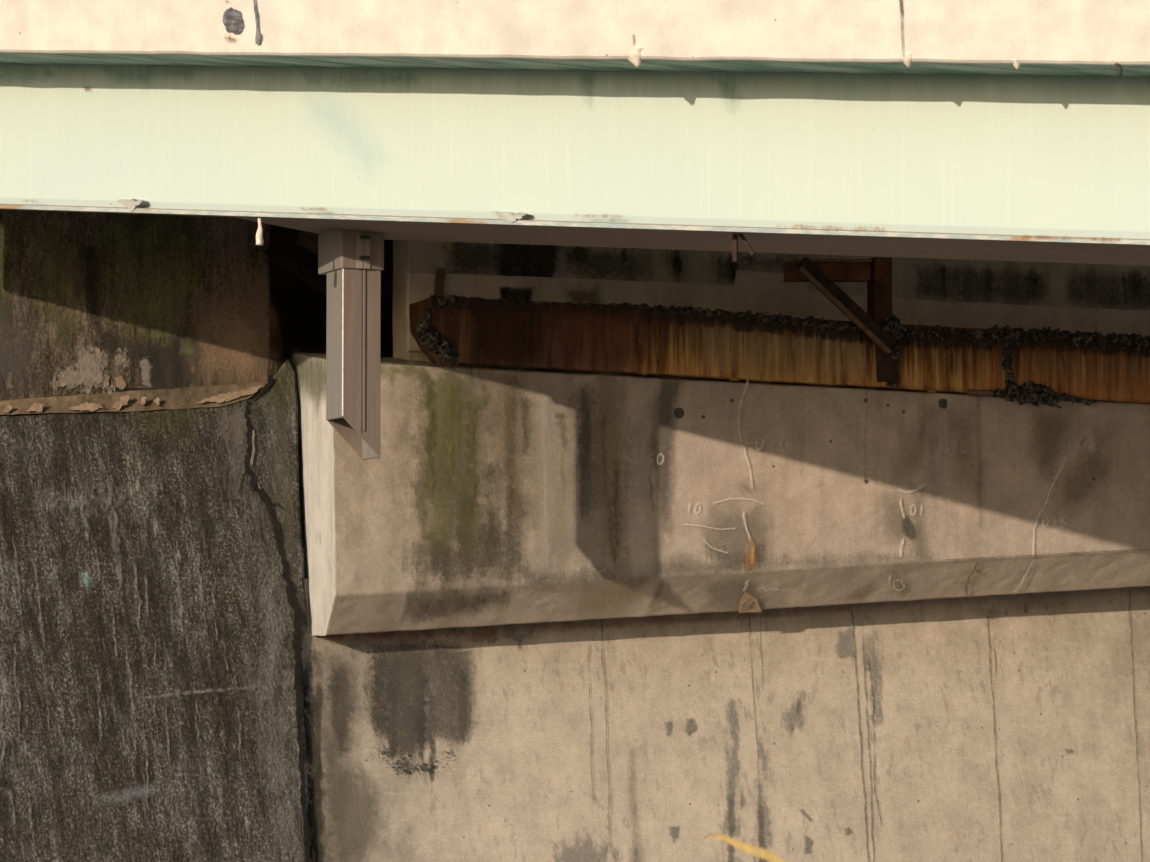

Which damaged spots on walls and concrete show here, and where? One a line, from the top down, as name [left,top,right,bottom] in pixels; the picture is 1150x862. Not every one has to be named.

peeling [26,403,43,413]
peeling [49,341,160,412]
leakage [84,247,201,390]
leakage [46,476,148,615]
leakage [111,607,255,738]
crack [238,377,310,862]
leakage [303,640,472,862]
leakage [414,388,616,618]
leakage [722,700,771,862]
crack [737,379,763,811]
crack [851,612,879,862]
crack [947,411,1146,595]